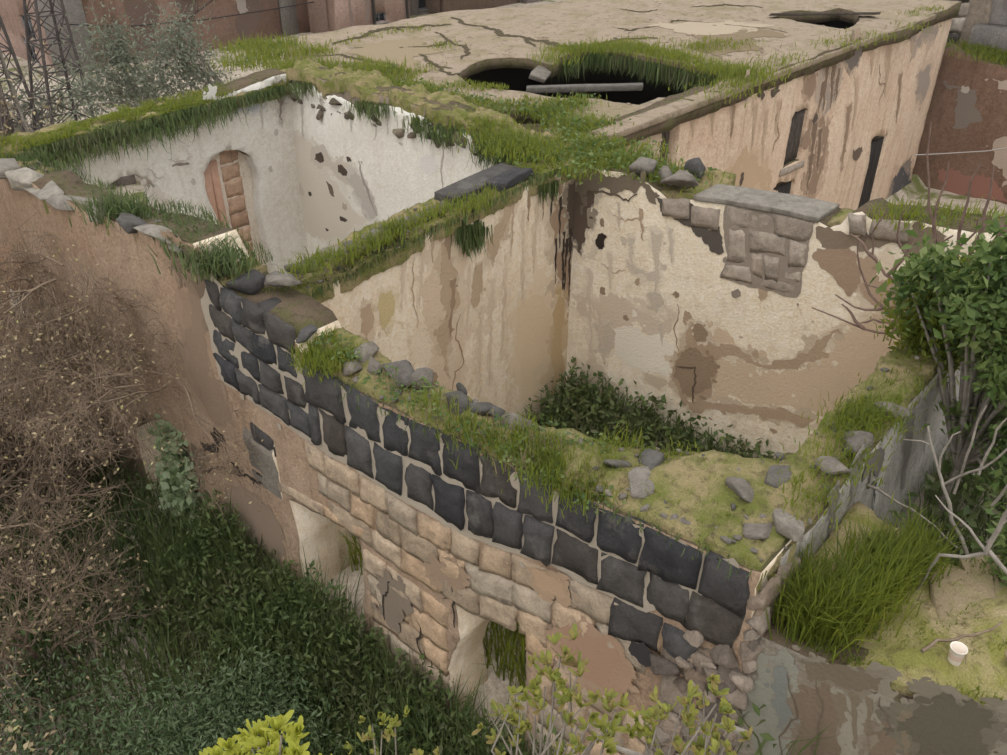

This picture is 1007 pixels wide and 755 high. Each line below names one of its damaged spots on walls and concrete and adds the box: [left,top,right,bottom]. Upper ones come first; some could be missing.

crack [322,17,560,75]
spalling [595,218,607,249]
spalling [575,169,663,215]
crack [602,3,788,44]
damp [724,94,783,192]
flaking render [673,203,946,301]
damp [794,44,903,199]
damp [909,23,983,131]
damp [352,166,909,438]
peeling [614,310,720,400]
crack [673,304,697,403]
peeling [742,647,804,755]